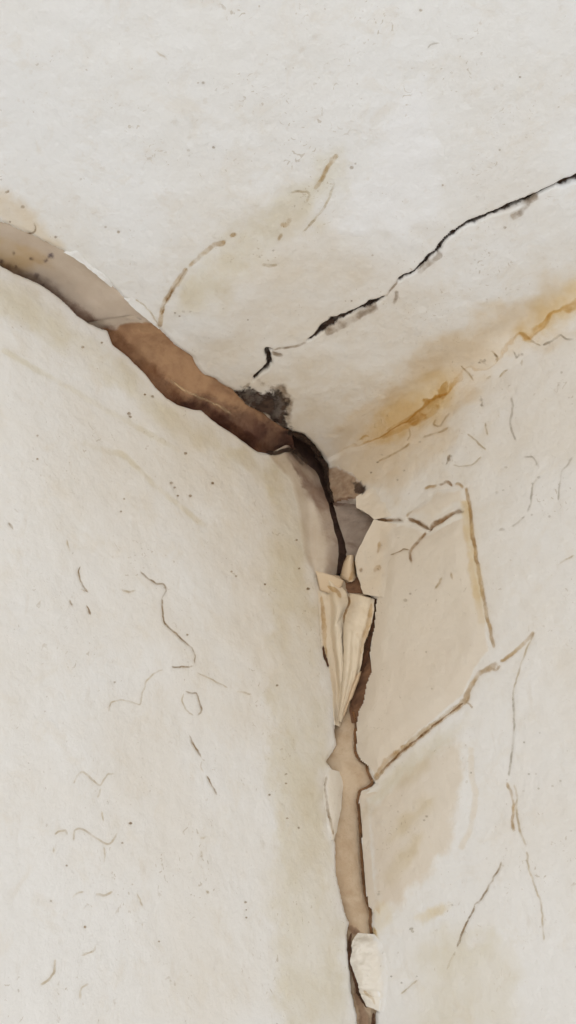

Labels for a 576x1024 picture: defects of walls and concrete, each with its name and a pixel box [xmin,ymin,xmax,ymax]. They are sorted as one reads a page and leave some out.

spalling [0,222,295,453]
leakage [234,387,290,430]
crack [253,347,272,378]
crack [308,173,576,339]
crack [378,514,452,559]
crack [360,594,377,673]
spalling [314,466,397,1024]
crack [348,711,375,1024]